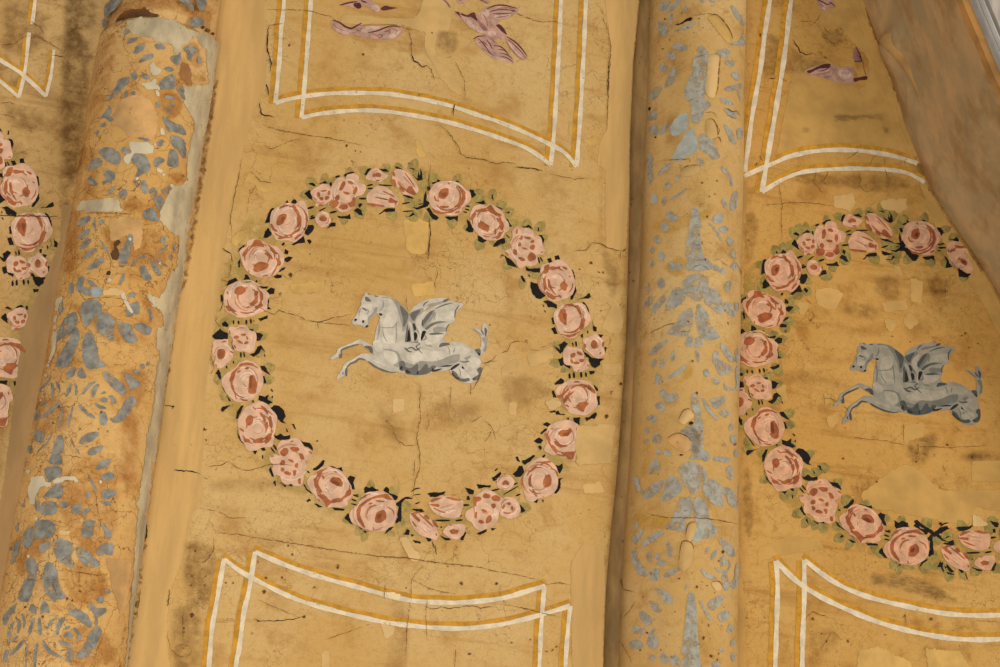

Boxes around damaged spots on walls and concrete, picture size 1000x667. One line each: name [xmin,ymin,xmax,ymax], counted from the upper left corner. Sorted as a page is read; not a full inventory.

flaking render [77,198,123,212]
peeling [40,296,63,401]
peeling [103,271,133,313]
flaking render [124,17,219,667]
crack [210,164,270,373]
crack [249,303,346,325]
crack [449,341,545,404]
flaking render [26,469,78,504]
crack [177,461,288,479]
crack [385,395,429,493]
crack [197,509,565,655]